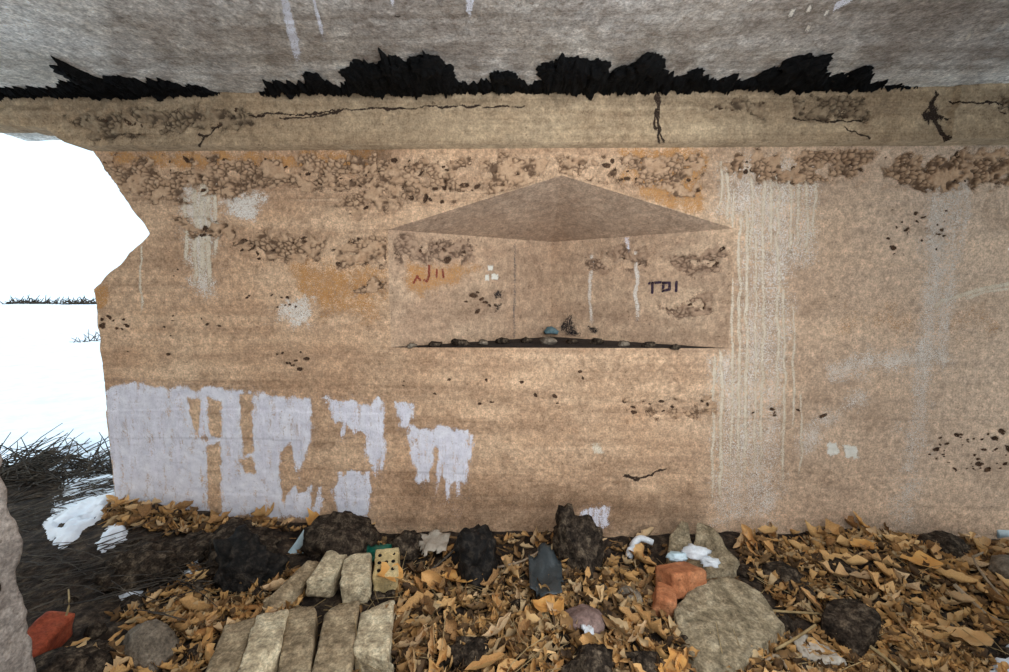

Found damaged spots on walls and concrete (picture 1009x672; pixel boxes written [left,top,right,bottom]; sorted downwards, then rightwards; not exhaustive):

crack [653,93,665,144]
crack [921,91,1009,142]
leakage [705,147,973,532]